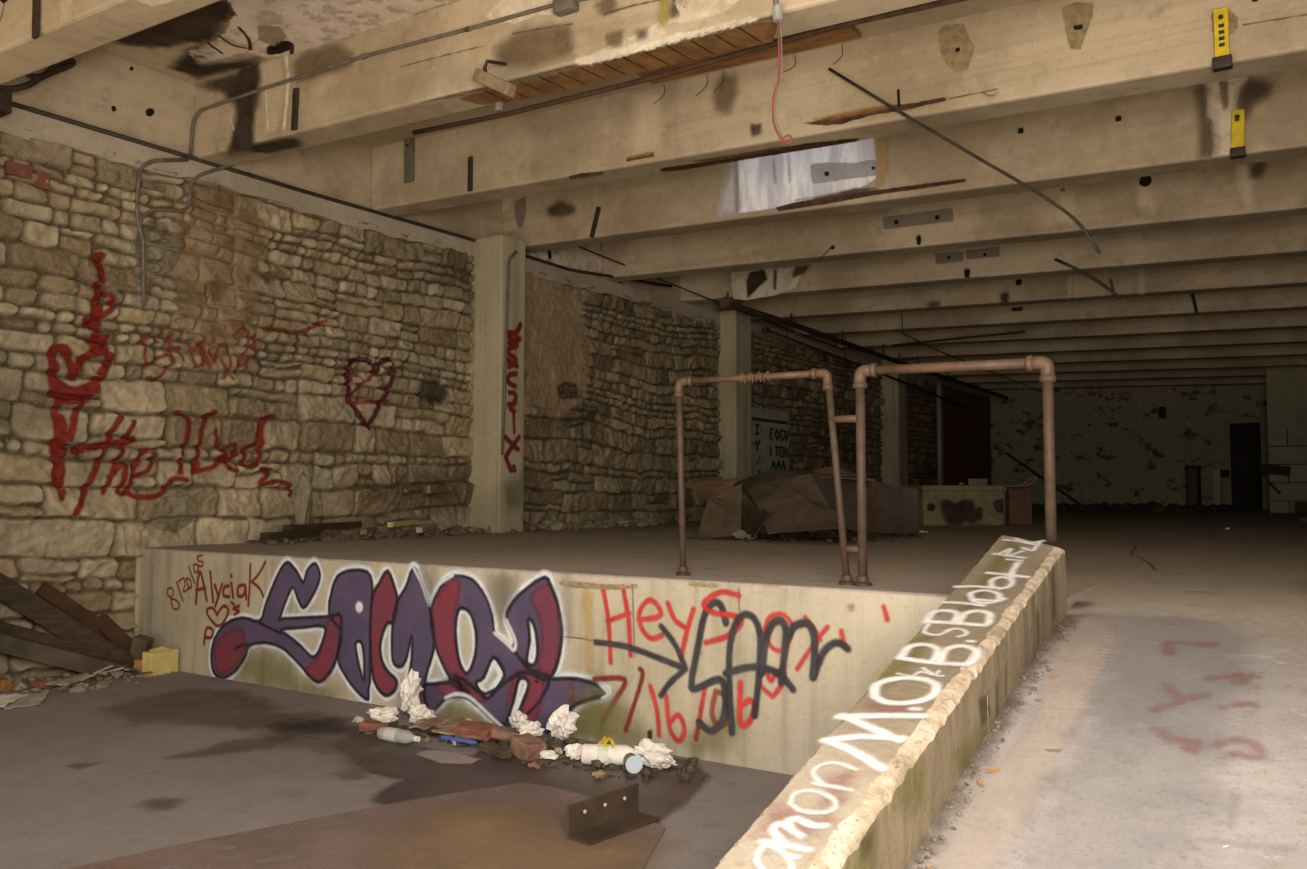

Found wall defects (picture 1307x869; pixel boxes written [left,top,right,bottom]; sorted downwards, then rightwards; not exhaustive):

spalling [424,0,777,105]
damp [498,0,757,66]
spalling [938,23,974,72]
spalling [1061,2,1094,50]
damp [204,46,351,155]
damp [1196,87,1212,156]
damp [1239,80,1270,112]